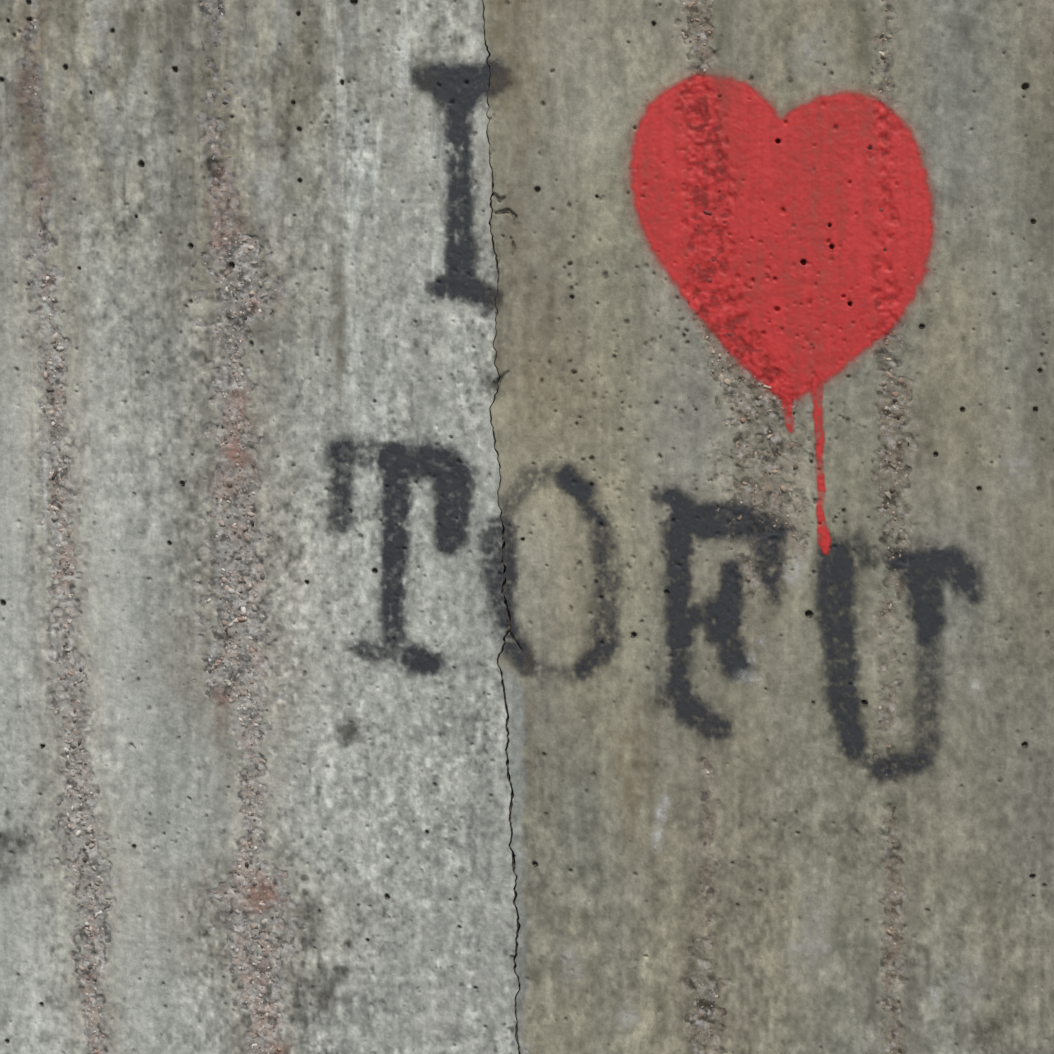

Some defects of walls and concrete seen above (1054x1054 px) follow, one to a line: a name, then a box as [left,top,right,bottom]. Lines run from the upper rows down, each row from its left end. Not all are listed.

crack [482,0,521,1054]